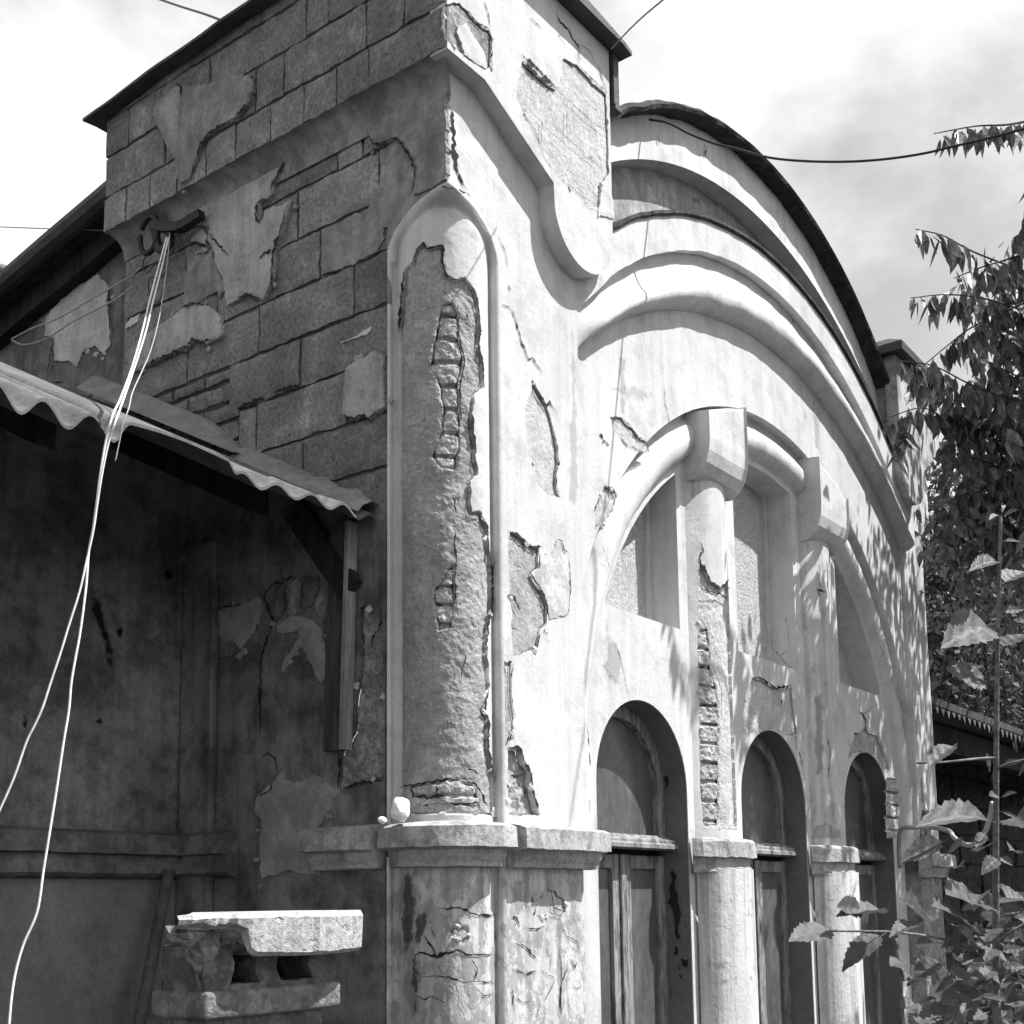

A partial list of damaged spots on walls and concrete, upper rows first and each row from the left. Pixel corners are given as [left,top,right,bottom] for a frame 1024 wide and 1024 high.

flaking render [152,74,256,195]
flaking render [320,88,451,276]
spalling [516,55,614,219]
flaking render [42,274,115,373]
flaking render [125,162,299,375]
spalling [341,241,570,817]
leakage [92,599,123,666]
flaking render [218,597,326,683]
flaking render [254,605,385,889]
spalling [696,543,734,831]
flaking render [849,712,900,839]
crack [414,899,581,1018]